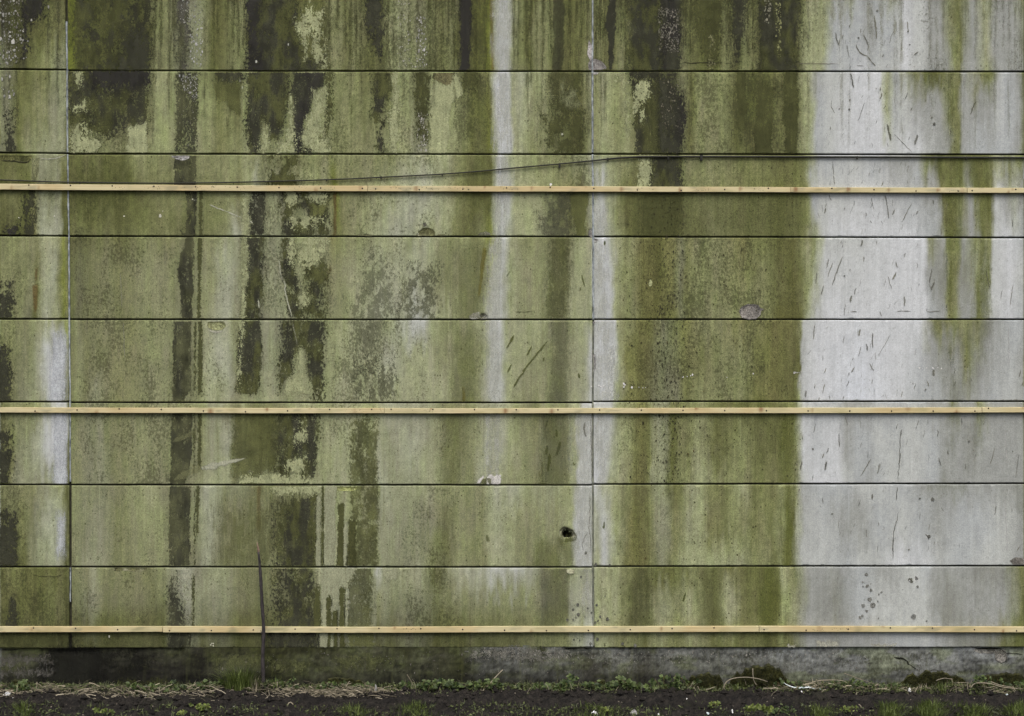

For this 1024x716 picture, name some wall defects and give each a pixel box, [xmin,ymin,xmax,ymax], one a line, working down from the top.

water stain [682,0,804,153]
water stain [153,0,203,648]
water stain [312,413,398,648]
spalling [559,527,577,542]